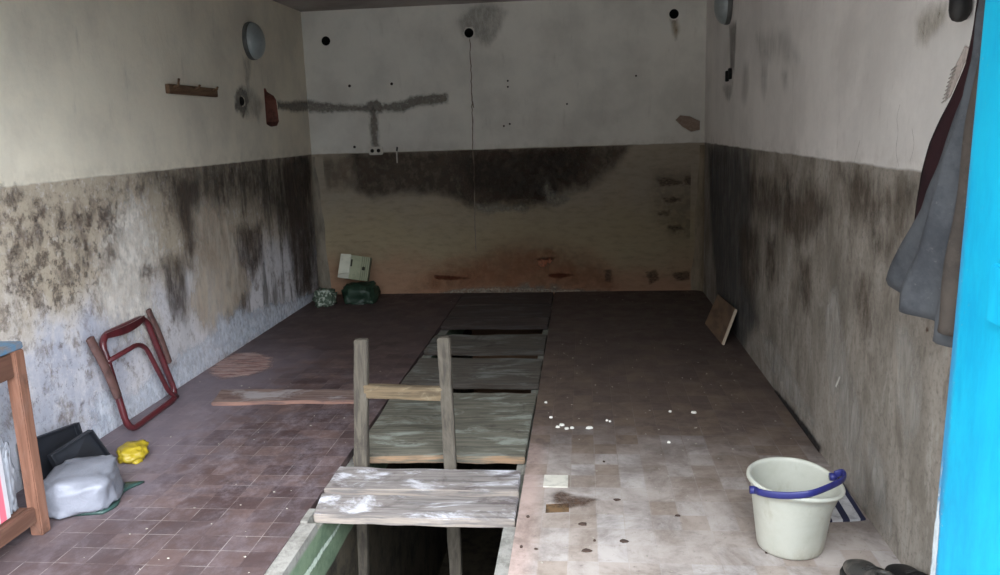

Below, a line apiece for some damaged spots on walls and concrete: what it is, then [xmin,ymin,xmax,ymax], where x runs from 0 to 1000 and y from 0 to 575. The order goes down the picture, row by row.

leakage [6,187,186,345]
leakage [92,156,318,439]
leakage [352,145,627,212]
peeling [675,115,700,132]
leakage [709,149,823,342]